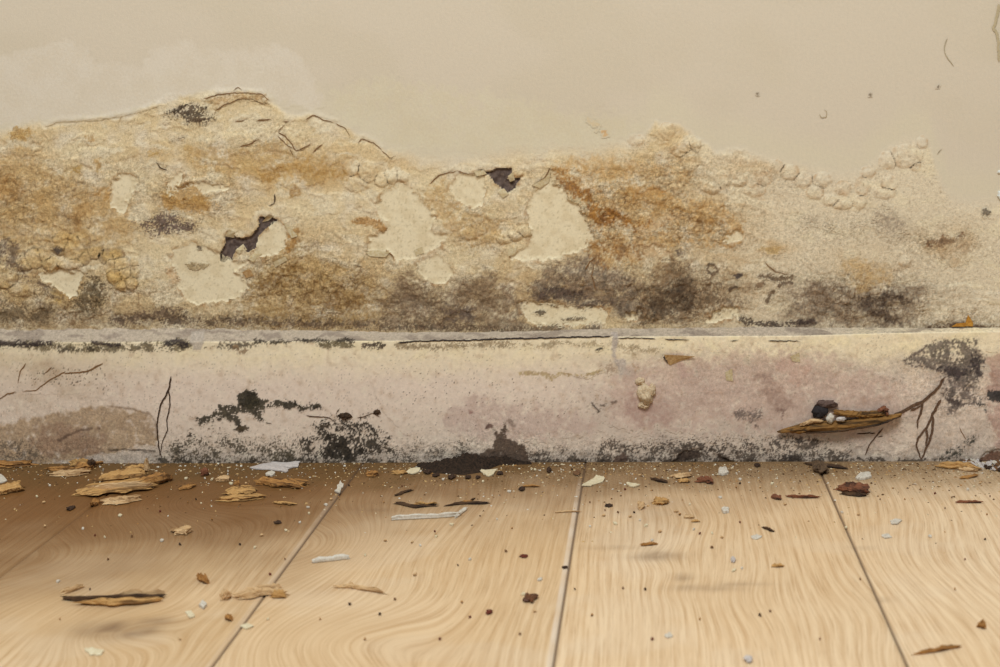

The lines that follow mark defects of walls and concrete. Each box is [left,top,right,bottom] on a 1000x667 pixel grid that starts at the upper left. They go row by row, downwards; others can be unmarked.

crack [204,87,394,158]
spalling [172,216,297,305]
spalling [366,182,453,284]
spalling [449,168,520,209]
water stain [0,37,1000,464]
spalling [508,171,594,262]
crack [0,363,103,399]
crack [156,377,171,458]
peeling [826,413,846,424]
crack [858,377,945,460]